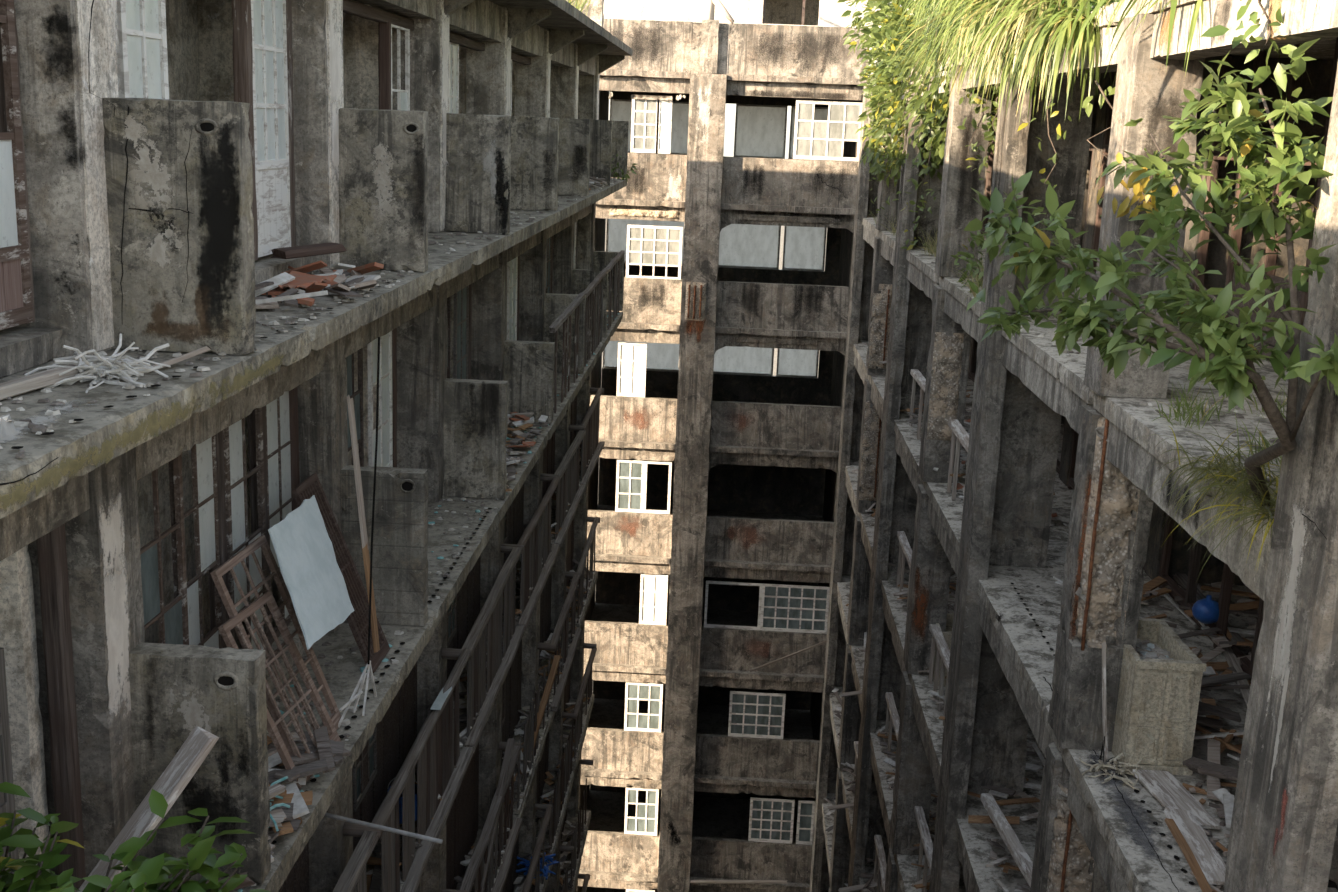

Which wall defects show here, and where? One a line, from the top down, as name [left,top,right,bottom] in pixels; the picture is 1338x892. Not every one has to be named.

water stain [44,11,77,78]
water stain [59,110,85,162]
crack [88,0,194,325]
water stain [146,125,240,344]
water stain [483,143,510,235]
peeling [99,494,131,716]
corrosion [1070,474,1092,641]